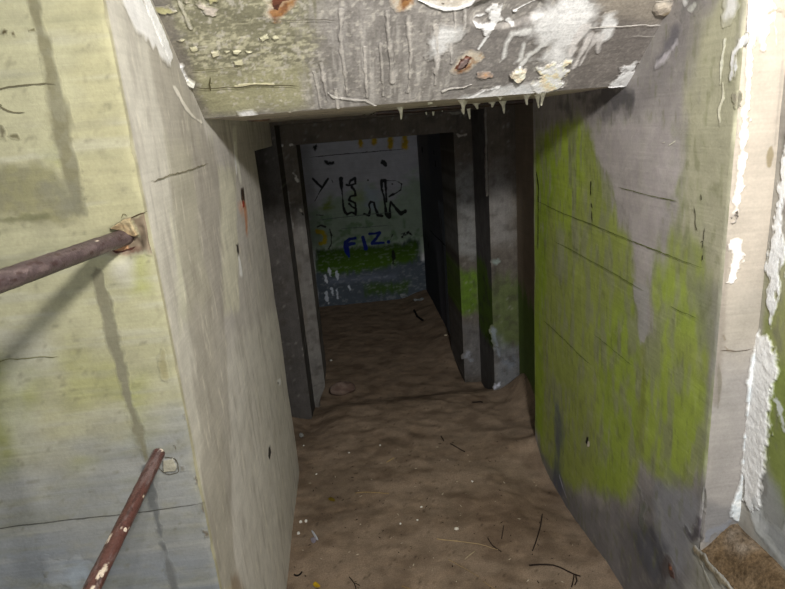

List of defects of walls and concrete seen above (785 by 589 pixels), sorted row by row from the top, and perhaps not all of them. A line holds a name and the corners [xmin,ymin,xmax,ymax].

crack [0,83,55,113]
water stain [0,0,91,236]
rust [260,0,303,25]
water stain [312,8,377,109]
rust [388,0,417,14]
spalling [417,0,476,11]
rust [448,45,486,76]
water stain [717,0,785,215]
water stain [405,0,685,454]
water stain [725,59,785,570]
water stain [89,265,151,475]
crack [0,502,203,529]